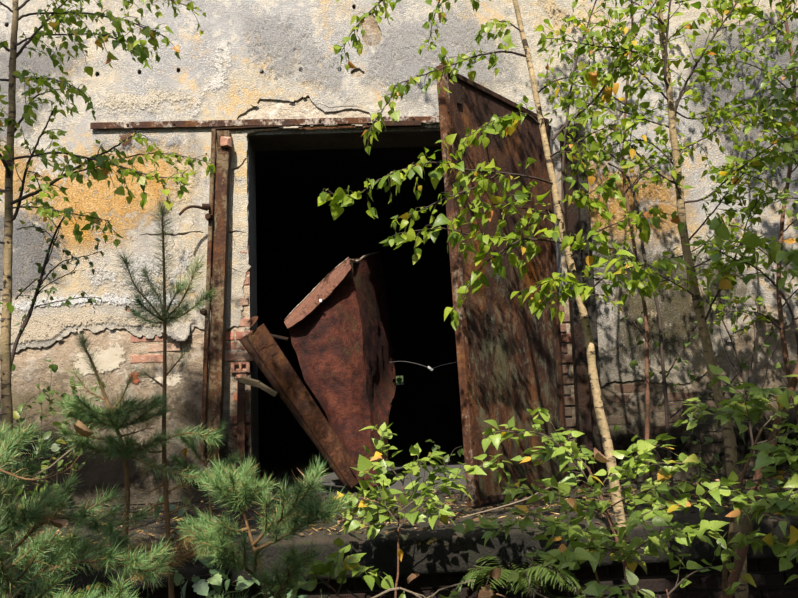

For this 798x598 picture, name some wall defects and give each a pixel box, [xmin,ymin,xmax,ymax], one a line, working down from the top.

spalling [11,249,255,507]
corrosion [522,254,541,298]